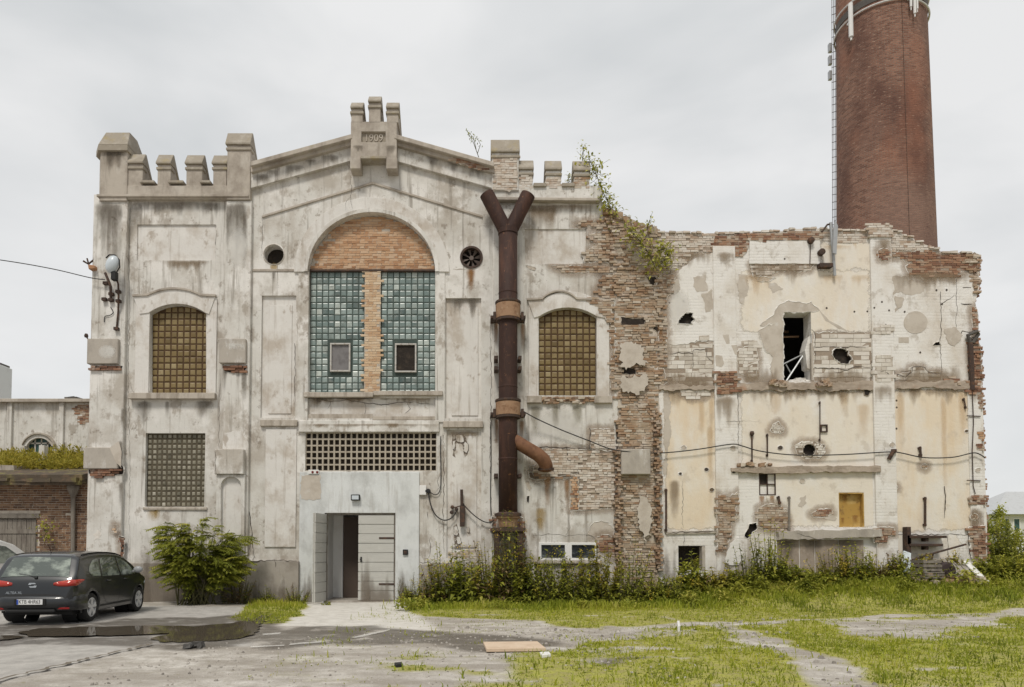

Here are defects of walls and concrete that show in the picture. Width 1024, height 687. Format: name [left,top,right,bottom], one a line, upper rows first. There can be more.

flaking render [542,216,986,476]
crack [814,280,975,379]
flaking render [72,405,89,424]
flaking render [709,478,837,554]
flaking render [965,494,991,564]